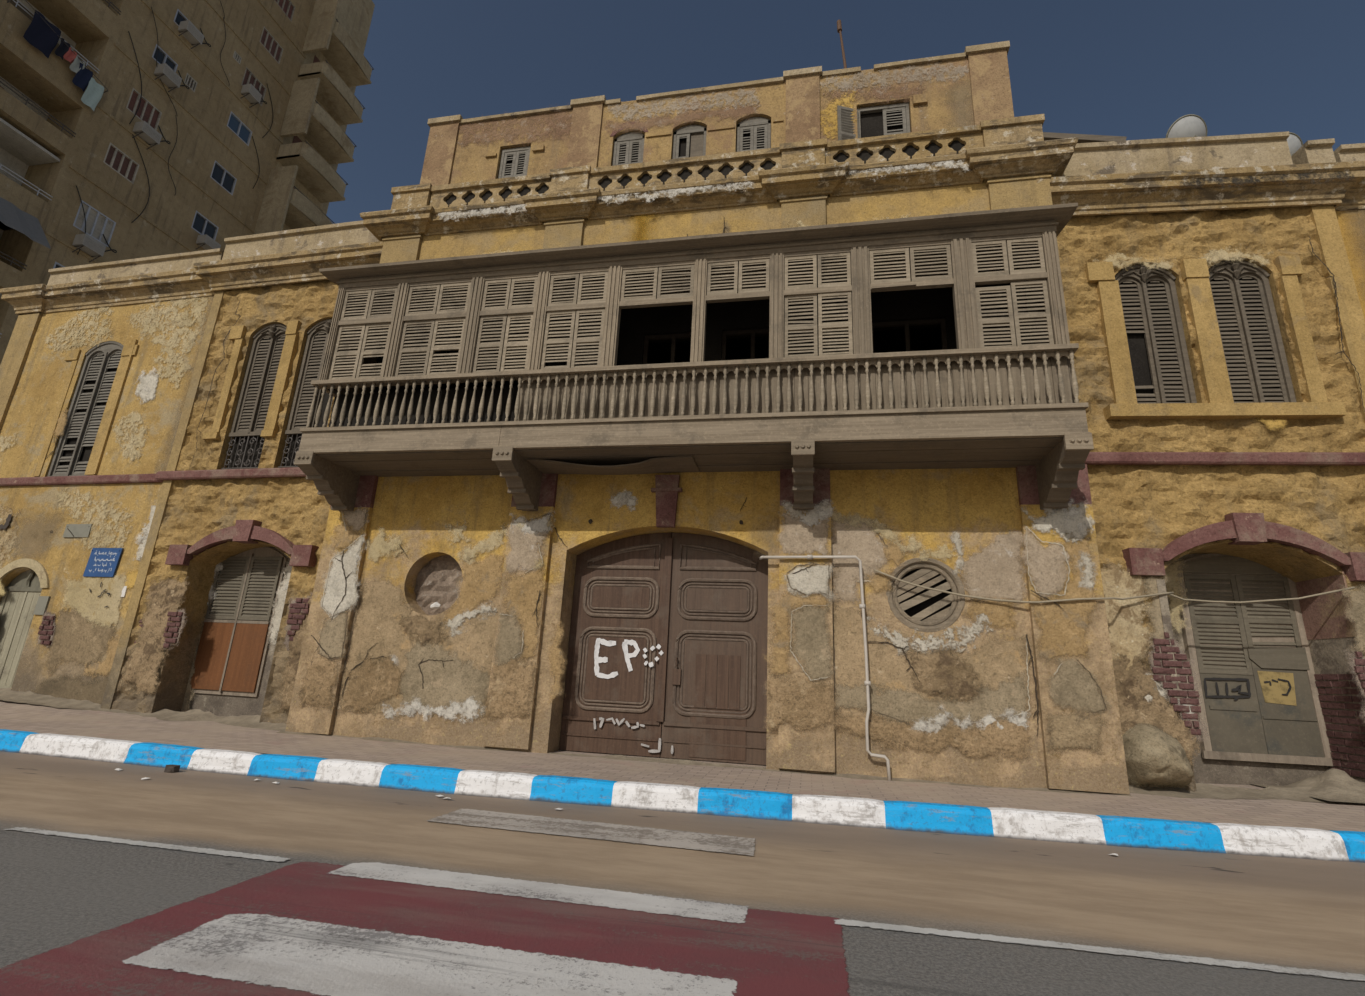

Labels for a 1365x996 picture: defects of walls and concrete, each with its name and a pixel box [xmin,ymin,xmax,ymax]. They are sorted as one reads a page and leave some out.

flaking render [269,507,564,723]